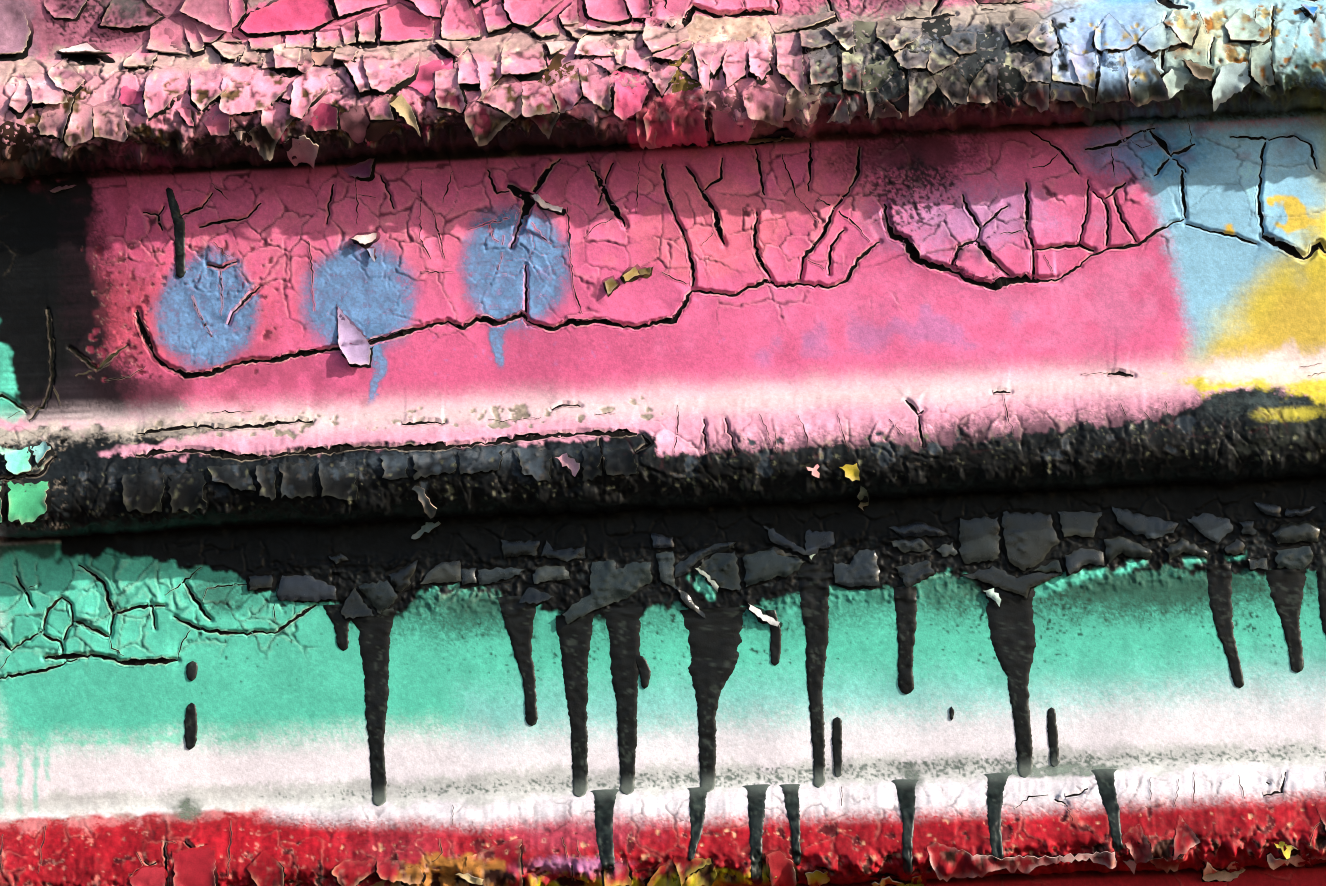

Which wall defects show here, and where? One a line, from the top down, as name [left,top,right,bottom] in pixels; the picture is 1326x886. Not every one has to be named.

peeling [0,0,1276,182]
crack [0,0,1326,422]
crack [136,400,850,472]
crack [889,398,926,447]
crack [993,387,1015,434]
peeling [0,441,55,524]
crack [0,455,55,517]
peeling [380,446,638,541]
peeling [245,500,1326,628]
crack [0,562,318,681]
peeling [330,854,426,886]
peeling [869,813,1201,886]